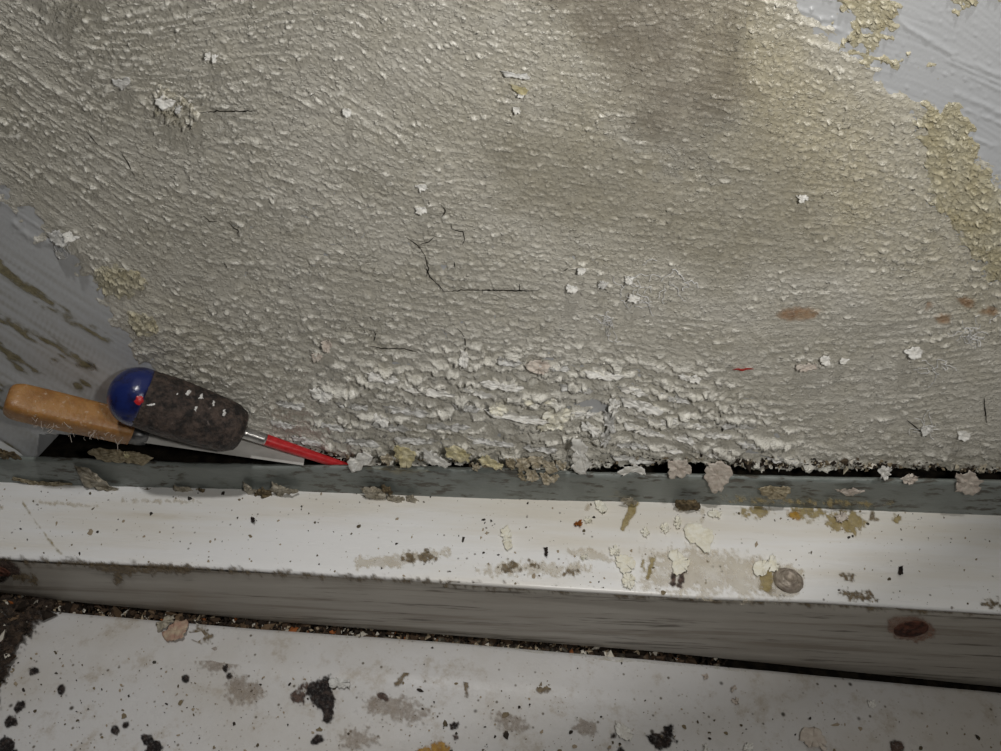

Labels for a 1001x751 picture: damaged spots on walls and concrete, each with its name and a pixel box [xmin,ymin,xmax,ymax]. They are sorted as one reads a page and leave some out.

peeling [951,0,978,16]
peeling [831,0,911,71]
peeling [912,100,1001,283]
peeling [47,231,80,260]
crack [407,202,534,292]
peeling [93,264,159,337]
peeling [132,134,1001,496]
spalling [38,434,289,464]
peeling [574,500,608,527]
peeling [668,548,690,576]
peeling [753,554,779,576]